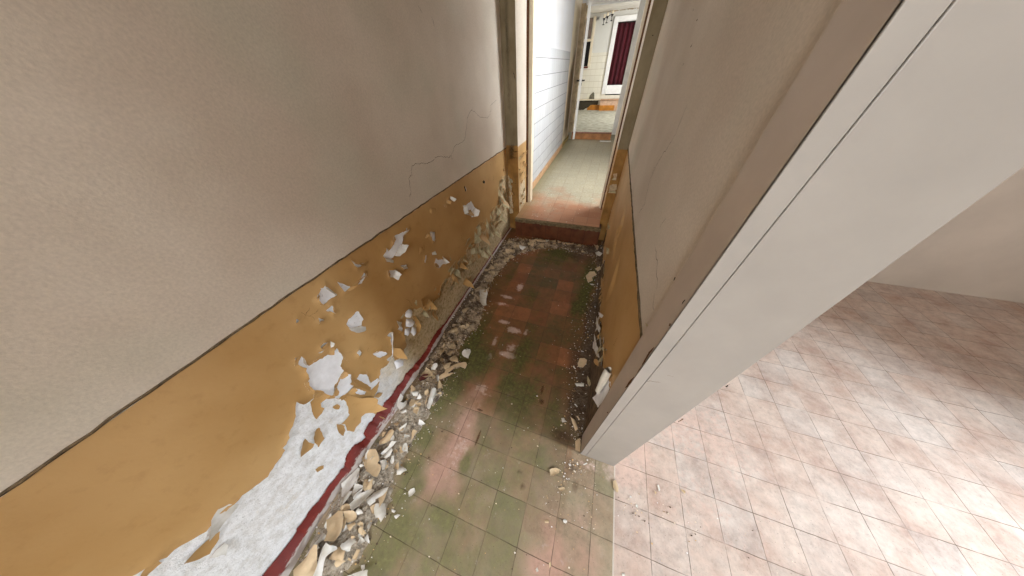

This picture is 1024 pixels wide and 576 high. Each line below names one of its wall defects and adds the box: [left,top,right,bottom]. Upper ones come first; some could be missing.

peeling [133,150,528,576]